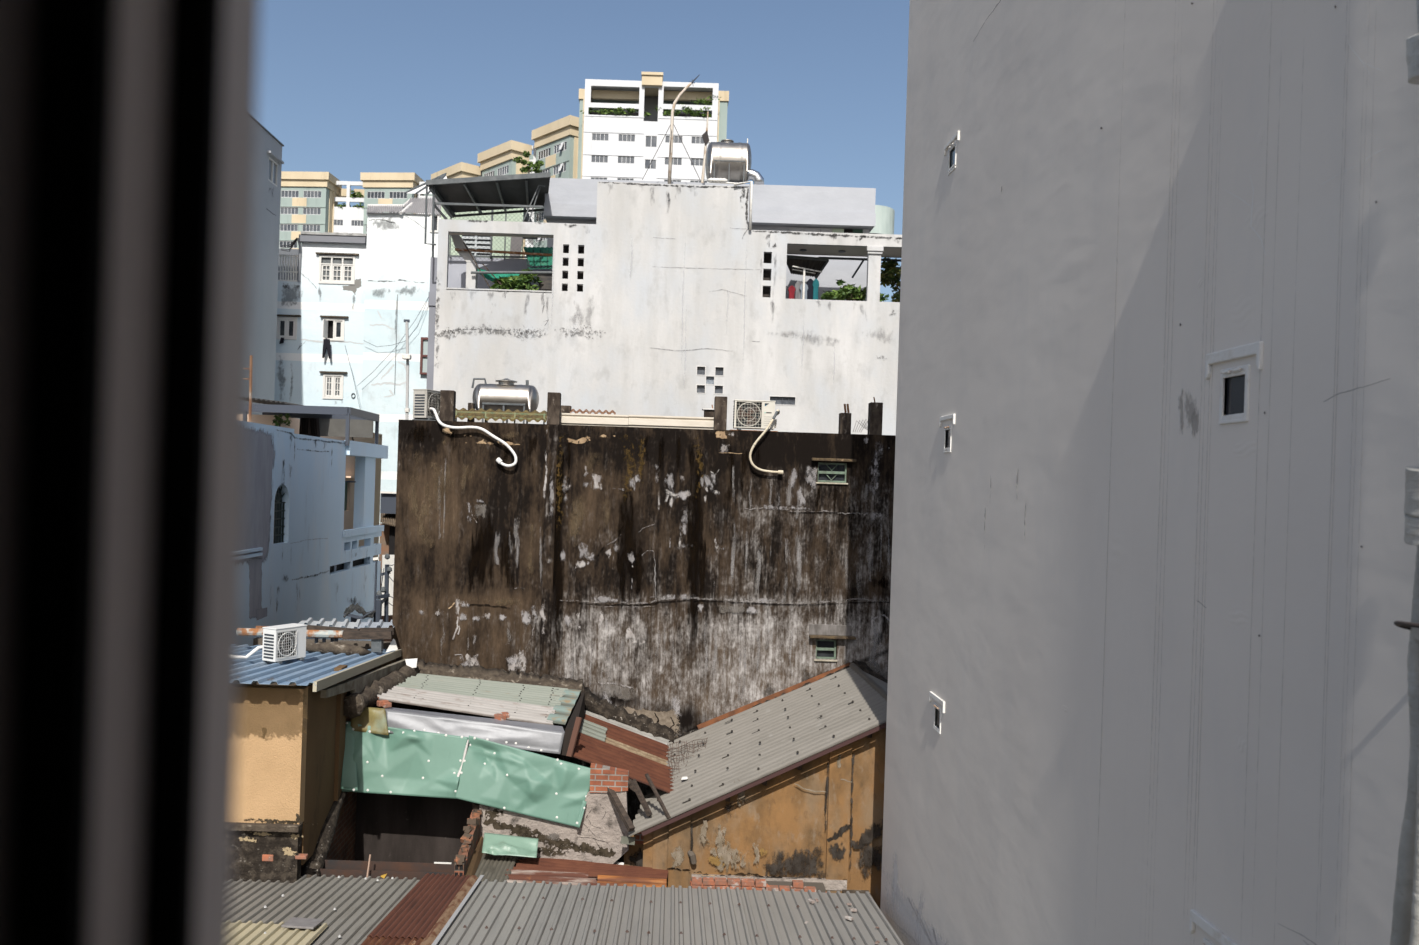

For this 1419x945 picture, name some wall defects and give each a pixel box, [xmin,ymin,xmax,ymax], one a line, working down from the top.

water stain [503,438,537,472]
water stain [791,467,852,529]
water stain [522,442,643,658]
water stain [645,435,759,635]
water stain [420,515,514,666]
water stain [871,576,890,645]
water stain [507,653,526,671]
water stain [764,755,946,945]
rust [361,873,484,945]